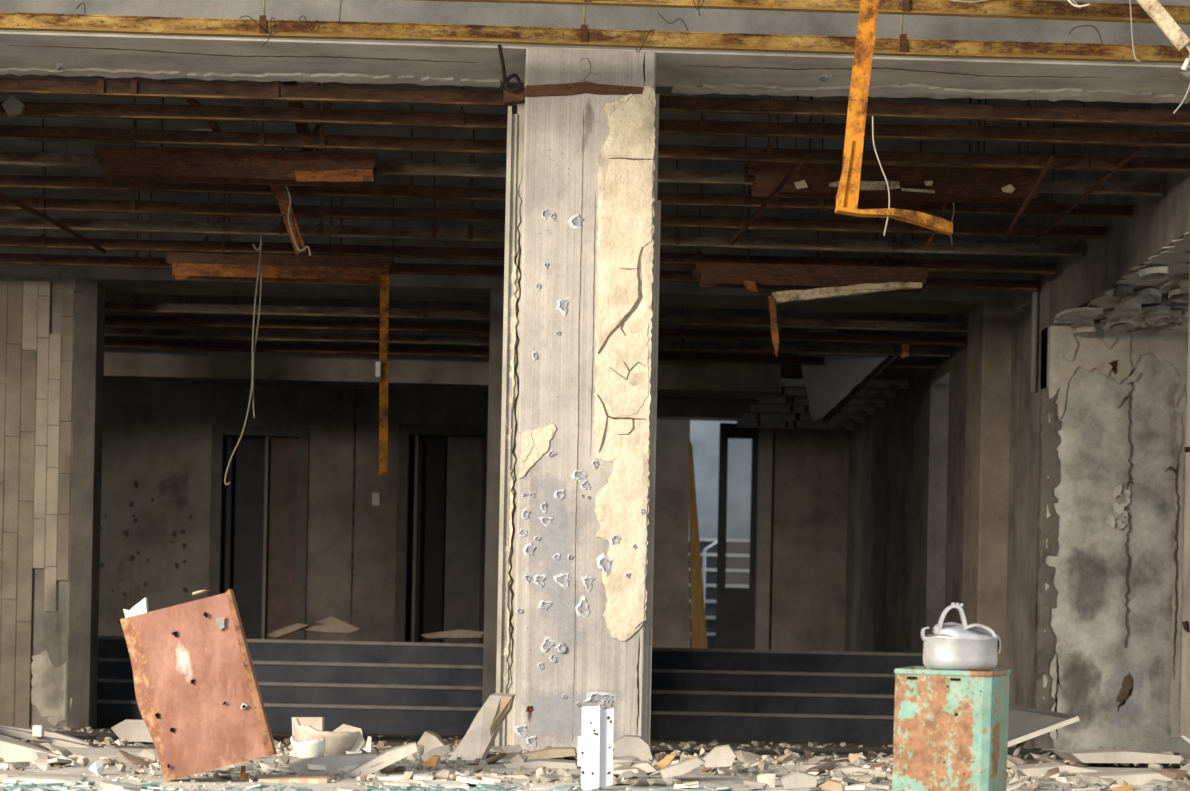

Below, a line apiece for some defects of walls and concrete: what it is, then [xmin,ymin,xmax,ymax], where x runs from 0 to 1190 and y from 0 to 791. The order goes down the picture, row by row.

spalling [672,74,850,98]
spalling [868,71,1190,104]
flaking render [517,85,656,641]
crack [574,128,654,616]
peeling [1034,232,1190,739]
crack [1118,332,1134,647]
crack [1166,449,1180,679]
spalling [537,636,566,670]
spalling [490,696,537,749]
spalling [561,692,617,709]
flaking render [1032,732,1054,749]